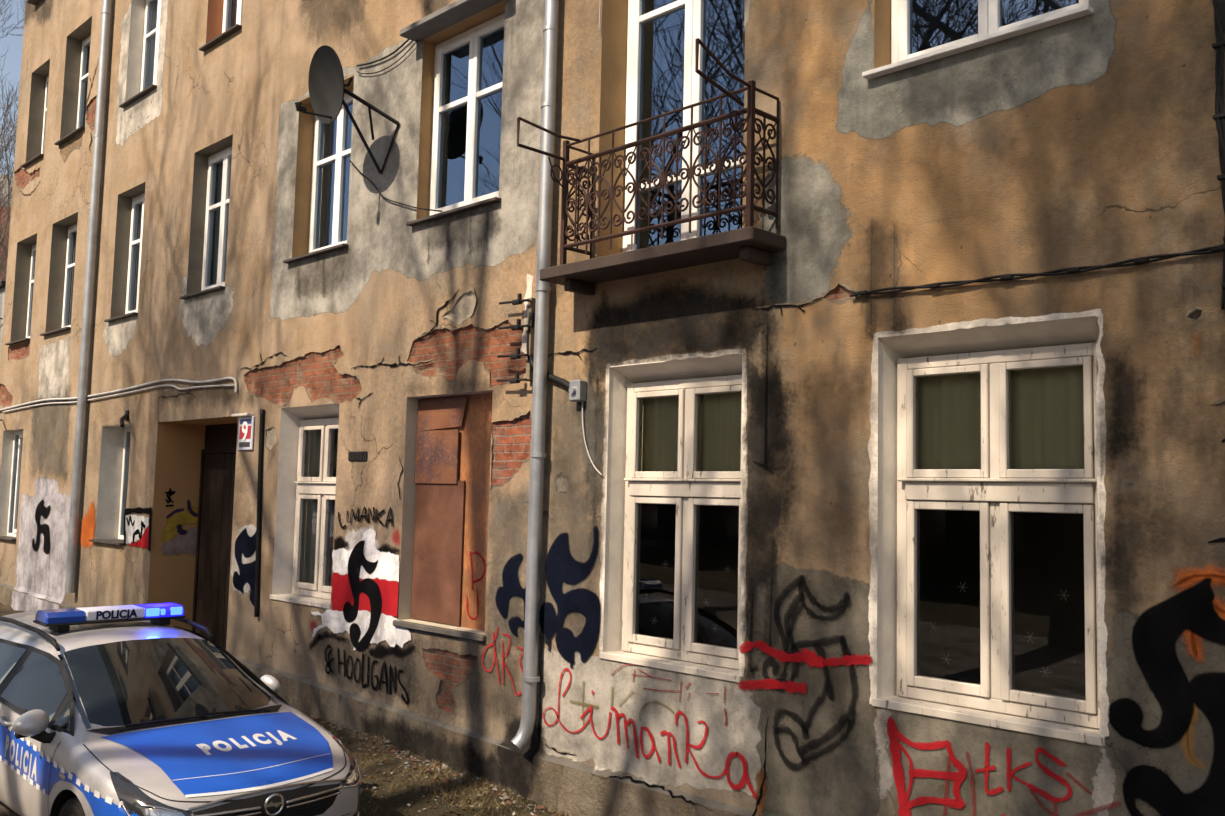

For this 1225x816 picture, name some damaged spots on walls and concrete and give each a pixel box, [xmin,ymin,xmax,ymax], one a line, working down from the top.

crack [351,288,479,408]
spalling [407,289,526,388]
spalling [823,283,860,304]
water stain [543,284,794,640]
crack [537,732,717,813]
crack [752,719,768,816]